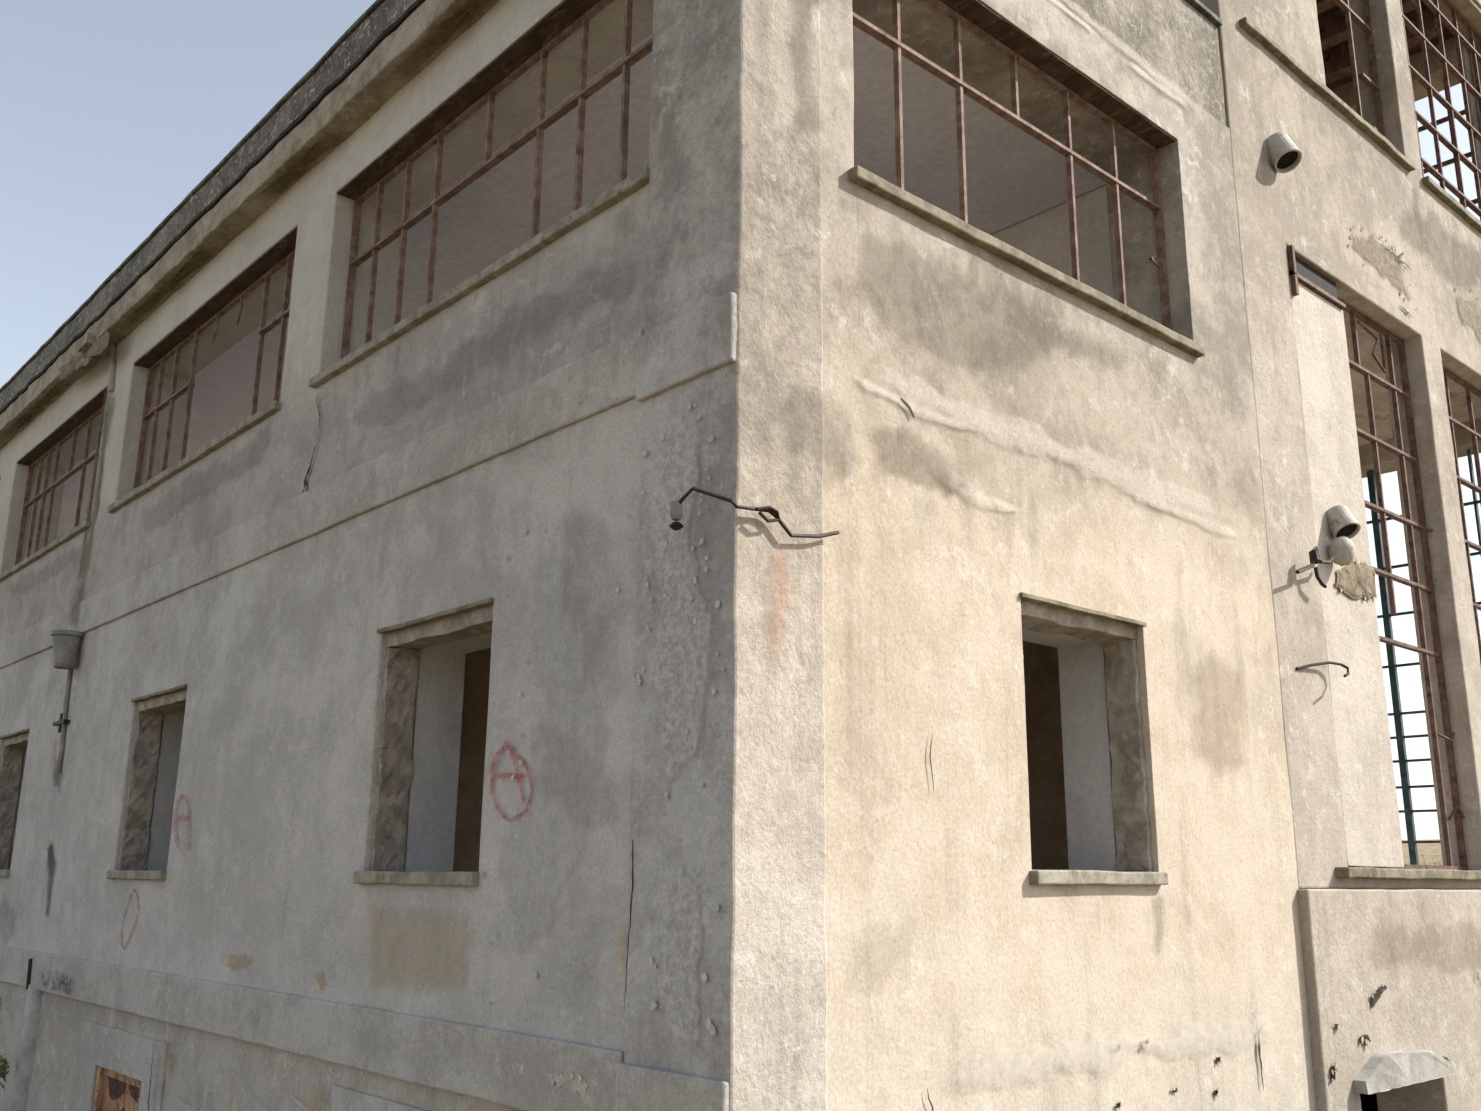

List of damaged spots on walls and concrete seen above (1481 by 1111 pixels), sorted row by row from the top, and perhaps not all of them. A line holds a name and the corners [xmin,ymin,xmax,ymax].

crack [302,394,320,493]
water stain [46,847,55,914]
crack [624,840,634,1012]